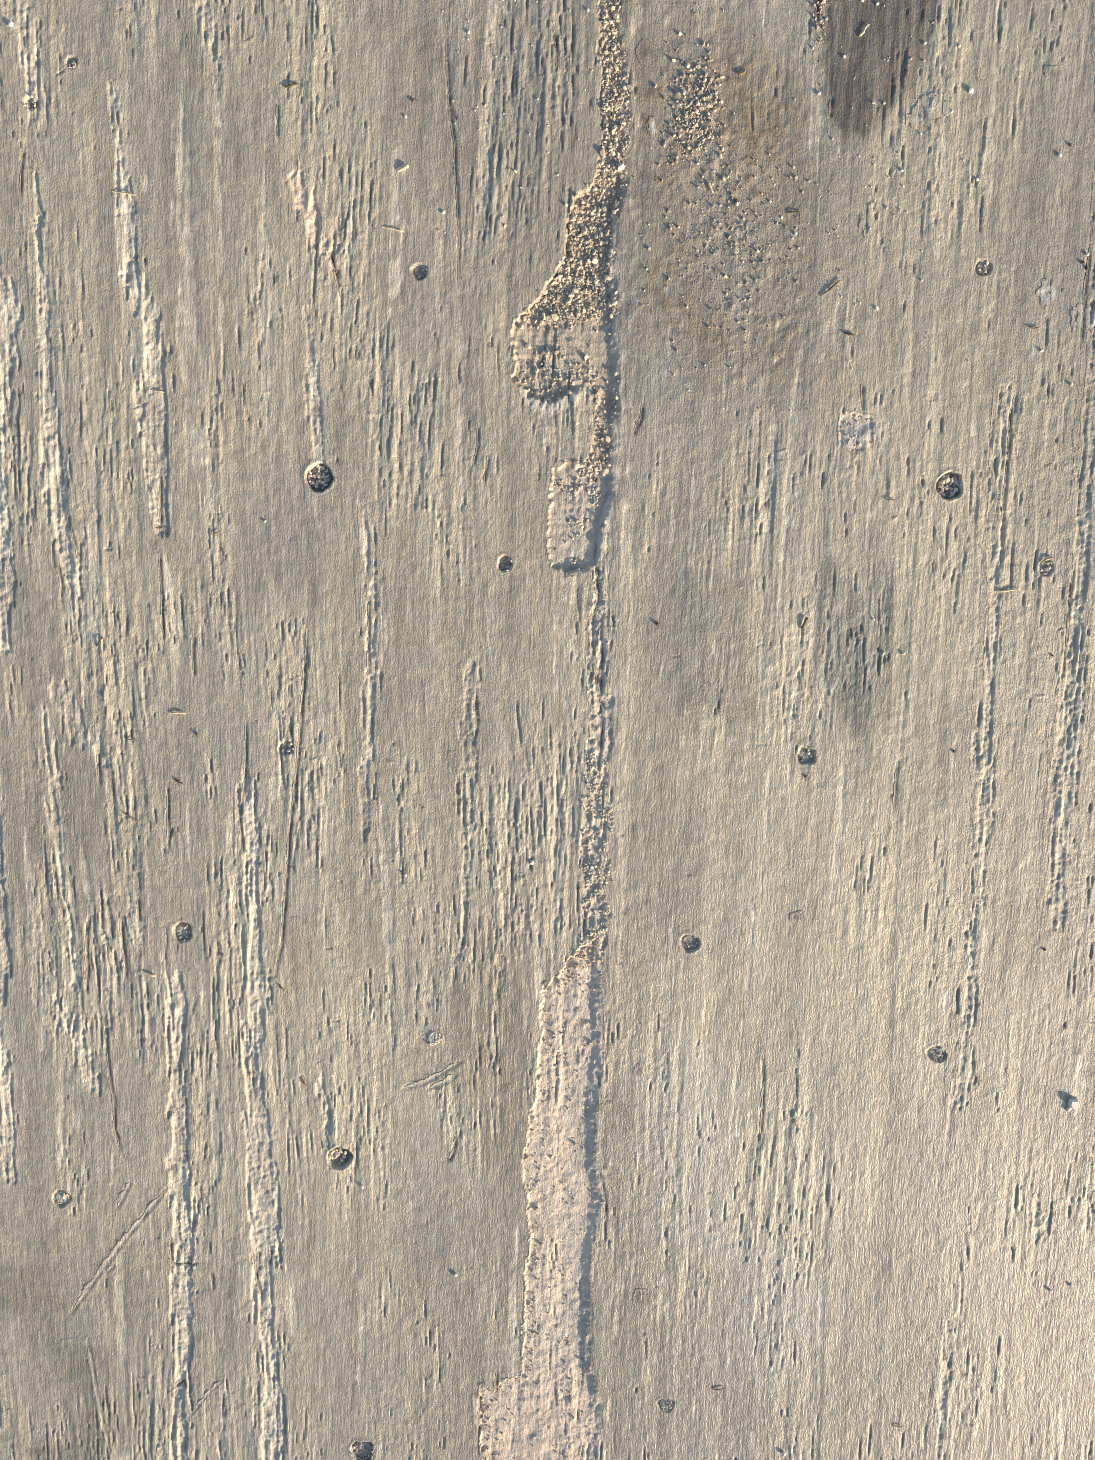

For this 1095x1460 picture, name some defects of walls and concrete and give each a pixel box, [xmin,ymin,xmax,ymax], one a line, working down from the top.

damp [414,0,602,318]
damp [616,0,948,404]
peeling [471,0,634,1460]